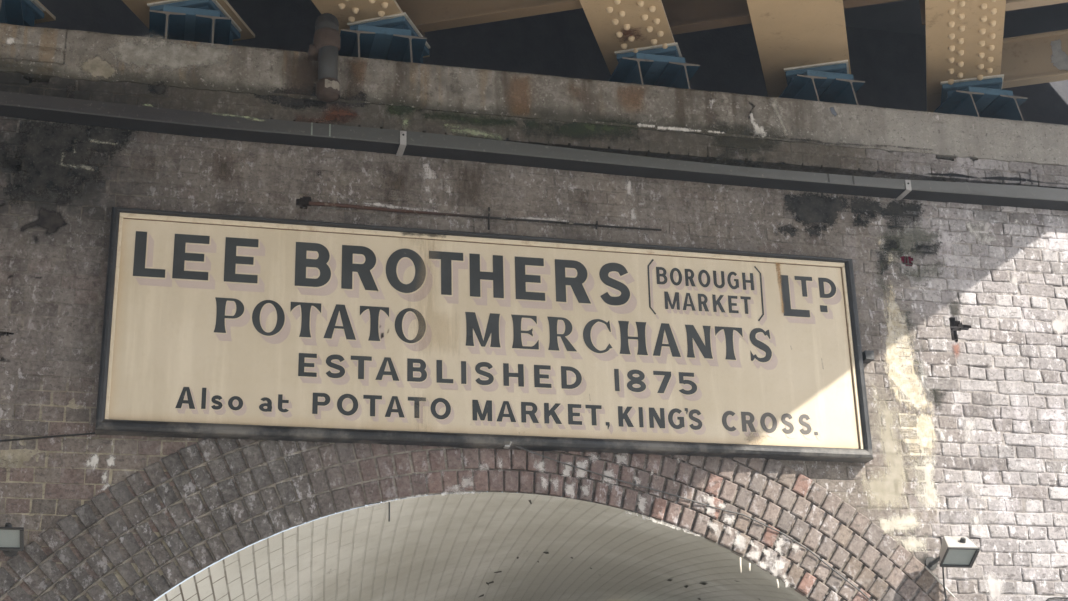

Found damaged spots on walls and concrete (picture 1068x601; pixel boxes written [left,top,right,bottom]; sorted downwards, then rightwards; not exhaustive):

damp [949,302,960,319]
spalling [949,317,971,341]
damp [880,285,946,563]